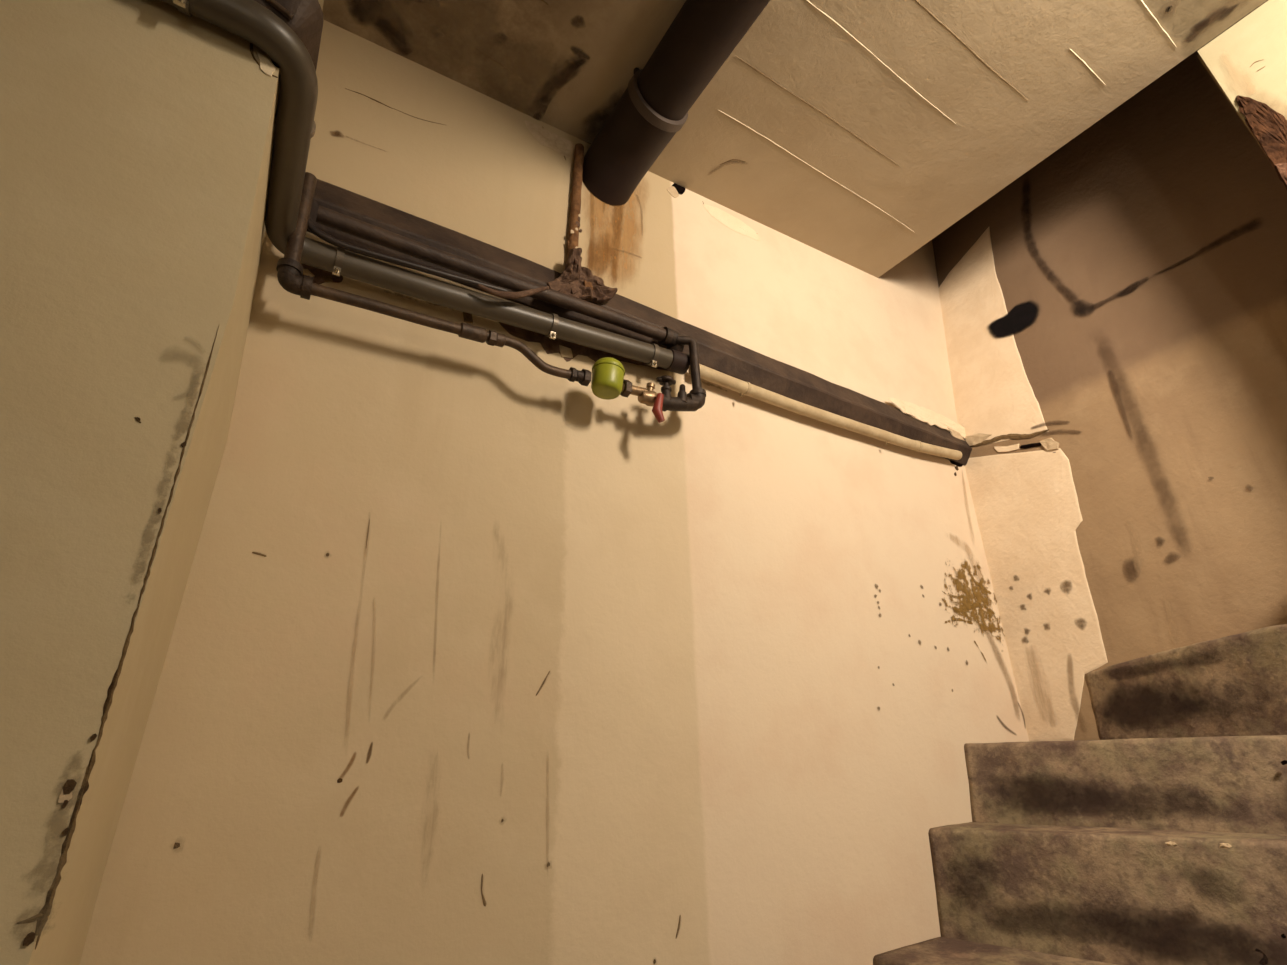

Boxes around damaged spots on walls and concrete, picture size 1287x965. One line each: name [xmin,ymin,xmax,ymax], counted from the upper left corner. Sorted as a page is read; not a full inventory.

mould [352,0,409,54]
water stain [1186,6,1236,42]
crack [345,88,444,125]
water stain [534,47,589,120]
spalling [1236,95,1287,190]
rust [546,192,638,303]
spalling [888,397,1081,453]
water stain [1109,371,1147,443]
water stain [1126,562,1137,577]